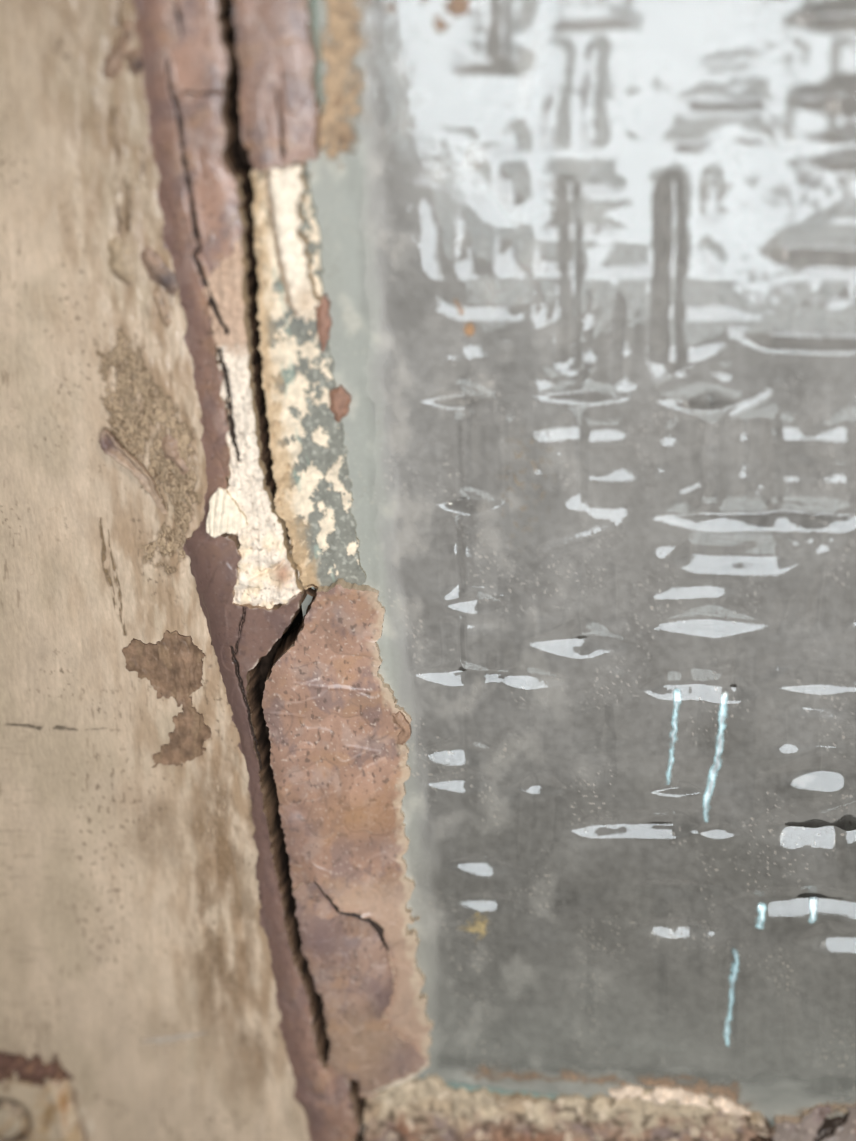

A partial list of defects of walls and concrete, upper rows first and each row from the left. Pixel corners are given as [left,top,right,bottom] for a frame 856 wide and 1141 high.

corrosion [434,0,469,32]
corrosion [319,0,367,159]
crack [166,0,293,548]
peeling [316,294,332,352]
peeling [330,385,352,423]
peeling [206,487,248,538]
crack [231,584,330,1063]
corrosion [0,1051,73,1086]
crack [350,1079,368,1140]
crack [813,1107,849,1141]